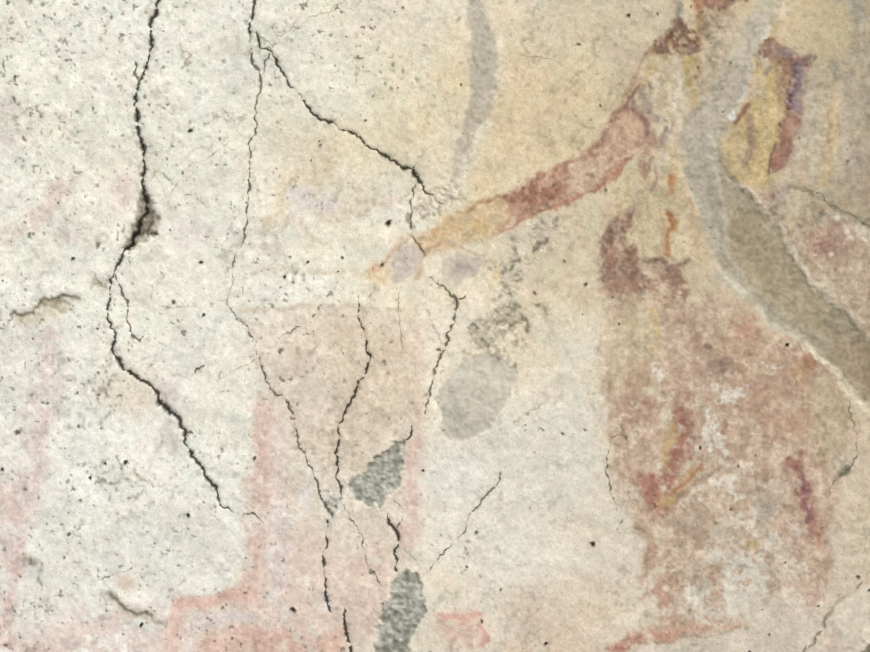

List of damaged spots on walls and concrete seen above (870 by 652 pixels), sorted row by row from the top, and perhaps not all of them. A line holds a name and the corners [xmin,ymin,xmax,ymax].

crack [801,189,870,227]
crack [105,0,506,652]
crack [828,368,858,498]
spalling [850,624,870,652]